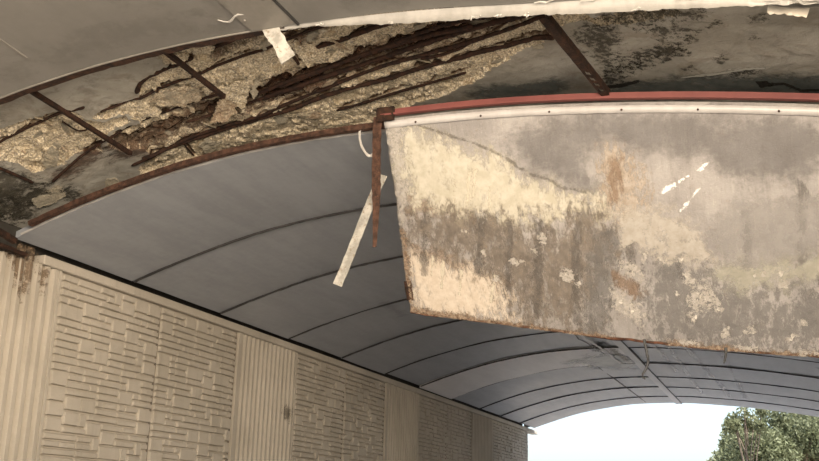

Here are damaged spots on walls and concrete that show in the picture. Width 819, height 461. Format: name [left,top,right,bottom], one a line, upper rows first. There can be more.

mould [0,168,83,226]
rust [52,97,221,182]
spalling [0,7,681,208]
rust [233,17,504,119]
peeling [386,127,409,228]
damp [467,78,568,99]
peeling [556,268,581,288]
damp [391,113,819,368]
damp [574,8,819,102]